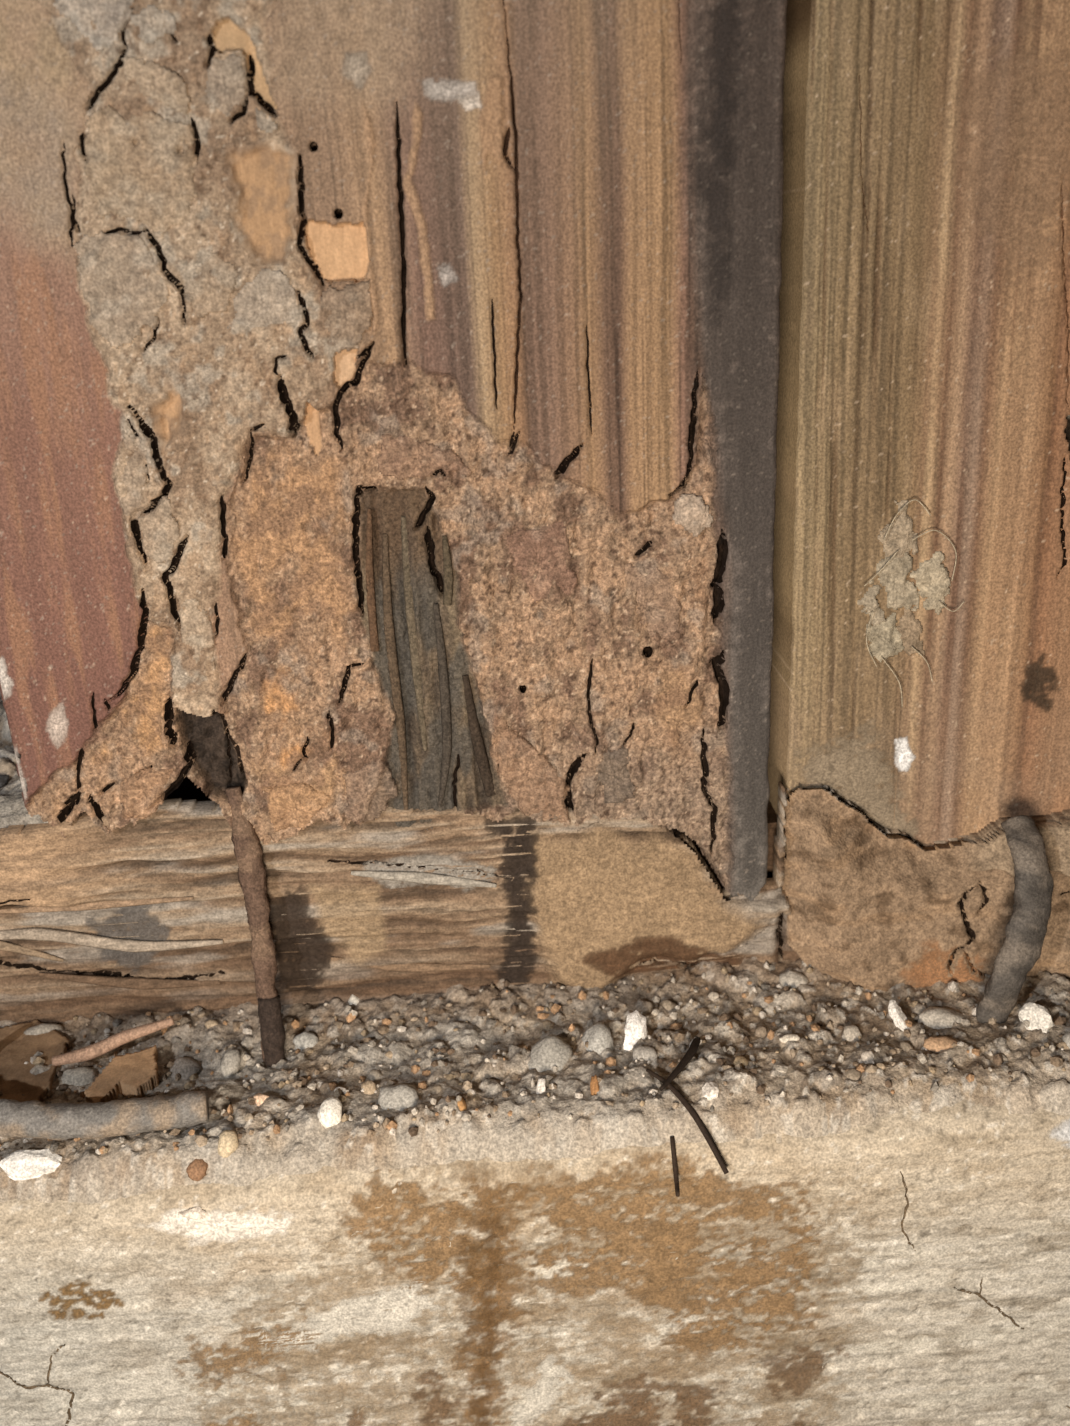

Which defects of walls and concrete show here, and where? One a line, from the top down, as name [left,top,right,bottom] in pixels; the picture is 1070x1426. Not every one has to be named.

crack [171,34,277,123]
crack [61,8,186,352]
crack [333,102,407,449]
crack [491,0,522,454]
crack [57,154,324,824]
crack [351,486,376,614]
crack [292,663,364,771]
crack [564,658,635,814]
crack [685,529,730,851]
damp [148,1207,293,1245]
damp [248,1283,439,1351]
damp [512,1355,573,1426]